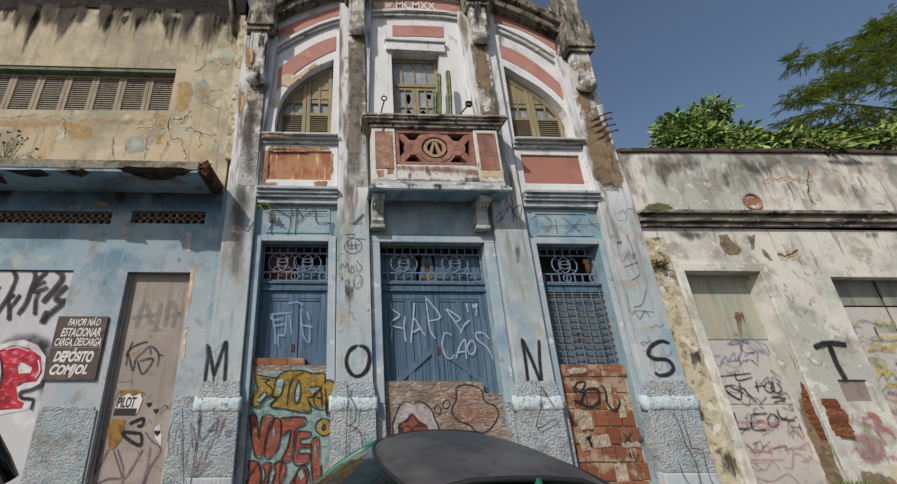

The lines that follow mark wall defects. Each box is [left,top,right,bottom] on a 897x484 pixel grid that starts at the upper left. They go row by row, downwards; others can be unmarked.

damp [0,0,239,47]
crack [110,20,232,160]
peeling [282,63,317,87]
peeling [477,44,495,114]
damp [244,101,256,163]
peeling [578,92,623,188]
spalling [0,169,51,184]
spalling [116,166,193,180]
damp [656,163,691,183]
damp [232,188,247,266]
spalling [719,234,772,260]
spalling [799,382,857,484]